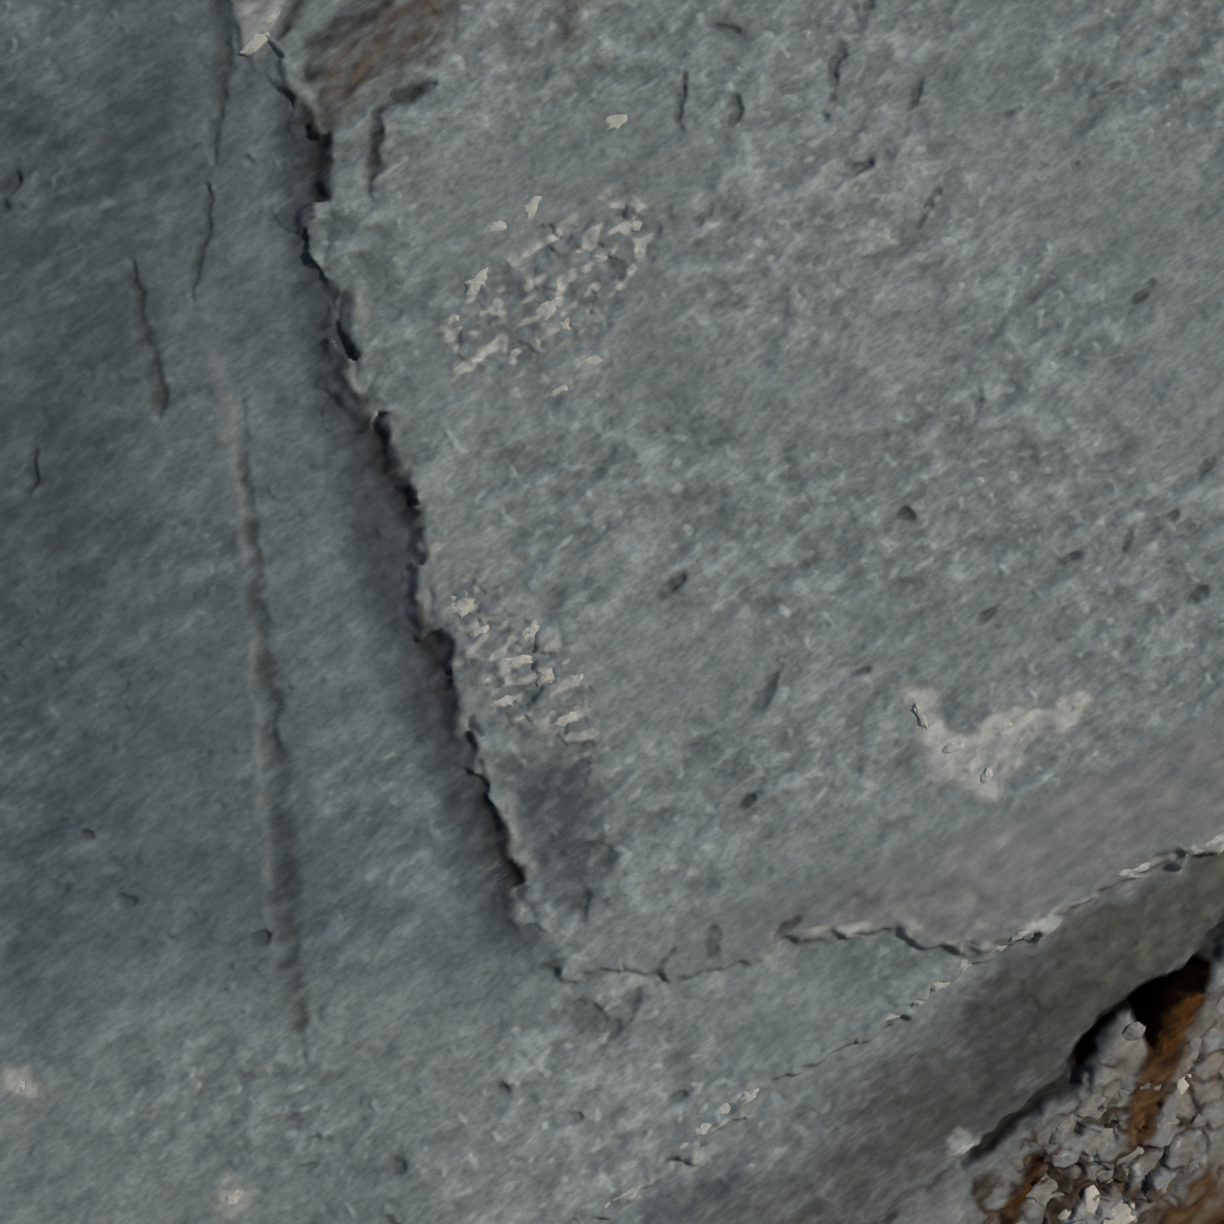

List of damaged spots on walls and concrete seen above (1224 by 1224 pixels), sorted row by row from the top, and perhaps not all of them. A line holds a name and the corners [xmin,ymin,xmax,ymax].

peeling [304,0,449,119]
spalling [429,559,599,904]
spalling [947,1129,979,1155]
corrosion [1000,1156,1047,1224]
crack [969,916,1224,1156]
spalling [972,995,1224,1224]
corrosion [1127,961,1210,1145]
corrosion [1160,1172,1224,1224]